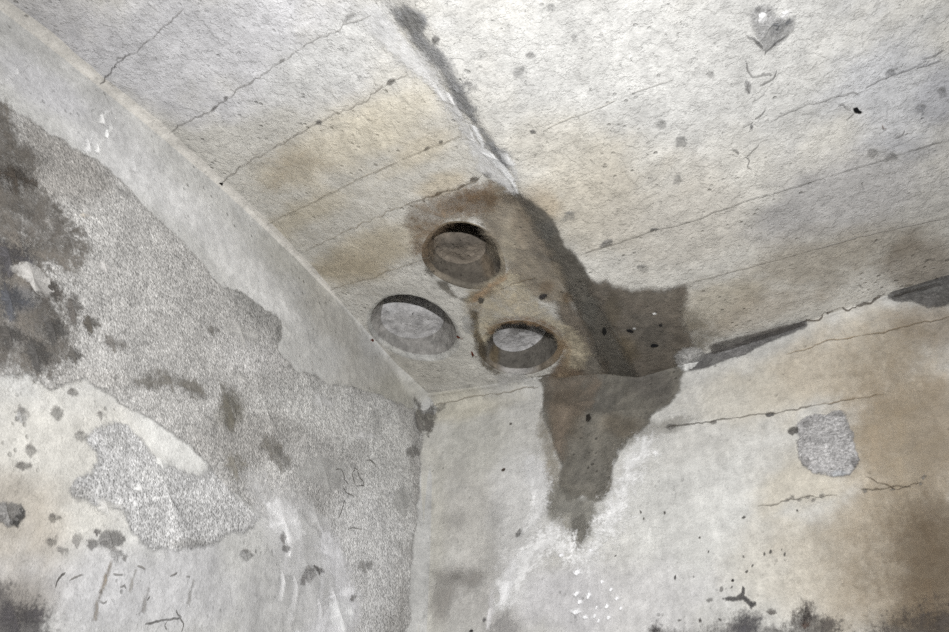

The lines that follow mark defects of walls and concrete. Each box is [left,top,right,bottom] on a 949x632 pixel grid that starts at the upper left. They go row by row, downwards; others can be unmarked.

spalling [751,5,794,49]
damp [0,102,101,378]
damp [365,5,714,628]
crack [788,294,949,354]
peeling [0,104,424,632]
crack [667,394,878,429]
spalling [788,410,860,477]
crack [758,494,833,506]
crack [861,477,924,493]